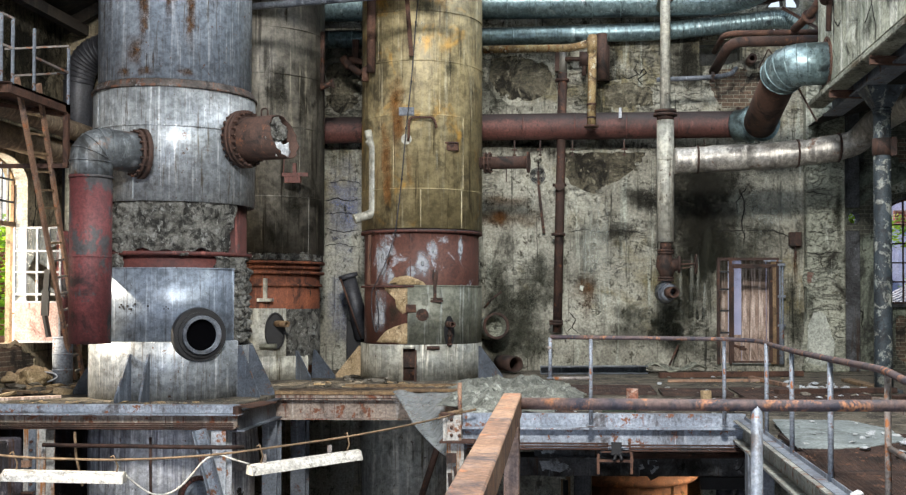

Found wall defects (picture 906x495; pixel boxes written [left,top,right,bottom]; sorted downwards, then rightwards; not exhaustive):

rust [119,0,160,76]
rust [186,0,195,41]
flaking render [483,53,556,107]
rust [382,90,404,165]
flaking render [565,148,651,197]
water stain [624,189,657,211]
water stain [674,171,759,300]
peeling [377,243,394,283]
peeling [408,243,437,276]
peeling [375,299,397,325]
water stain [619,305,694,352]
water stain [789,314,804,358]